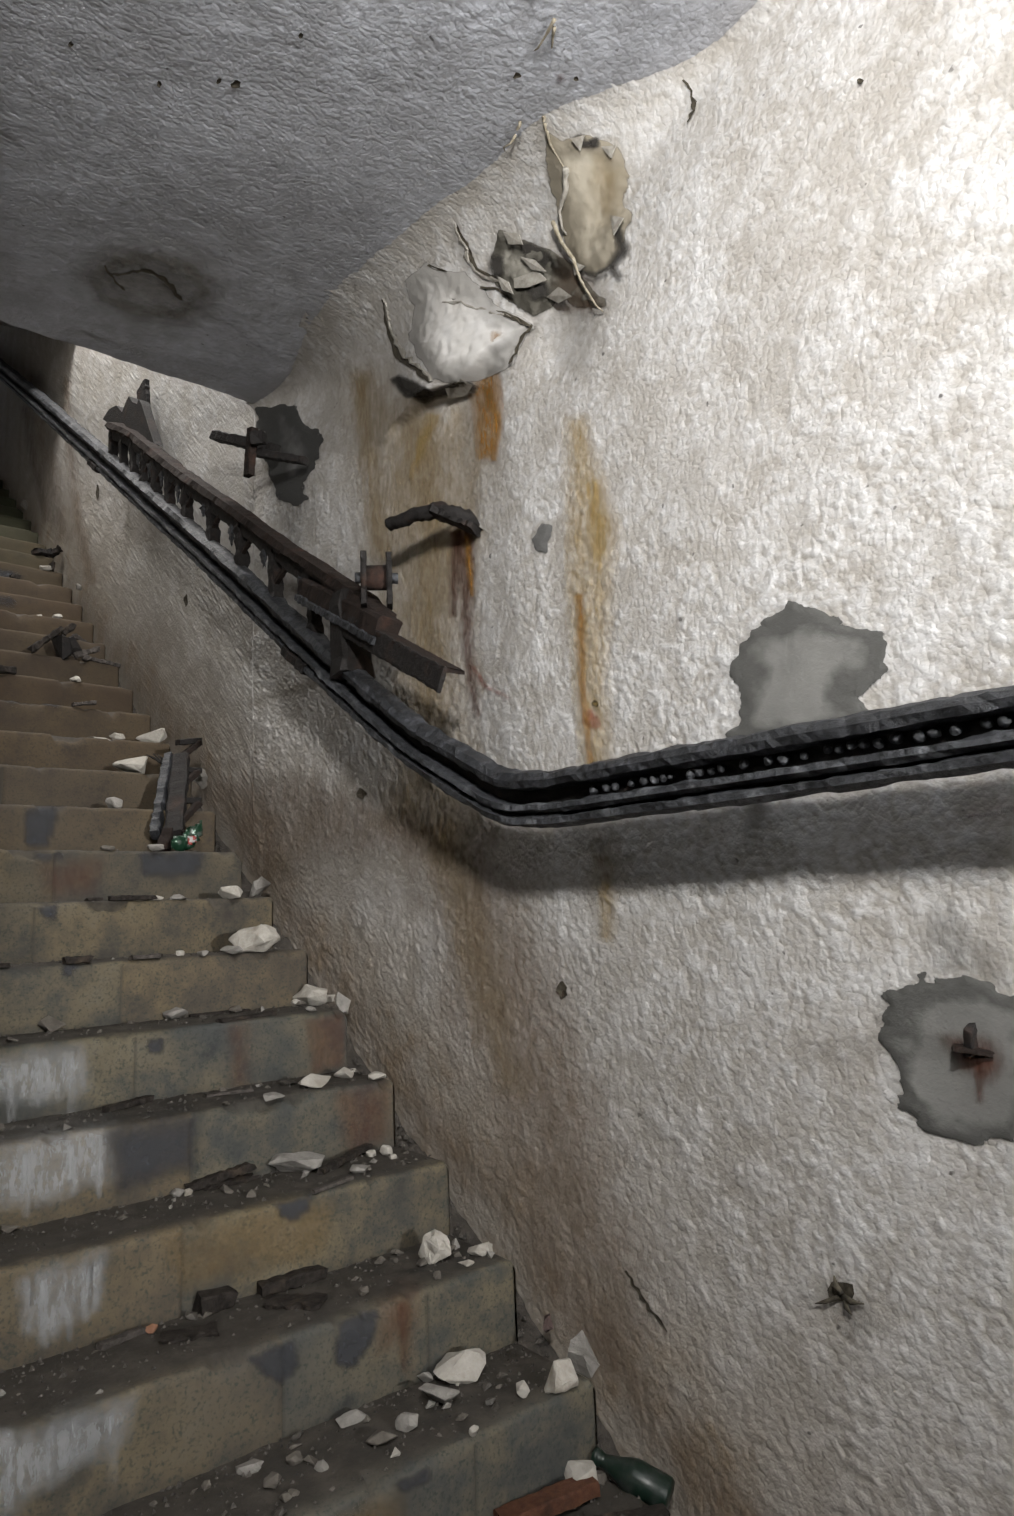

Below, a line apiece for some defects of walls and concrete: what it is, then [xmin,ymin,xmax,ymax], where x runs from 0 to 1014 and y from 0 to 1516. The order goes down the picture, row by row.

flaking render [489,133,632,316]
spalling [391,375,476,403]